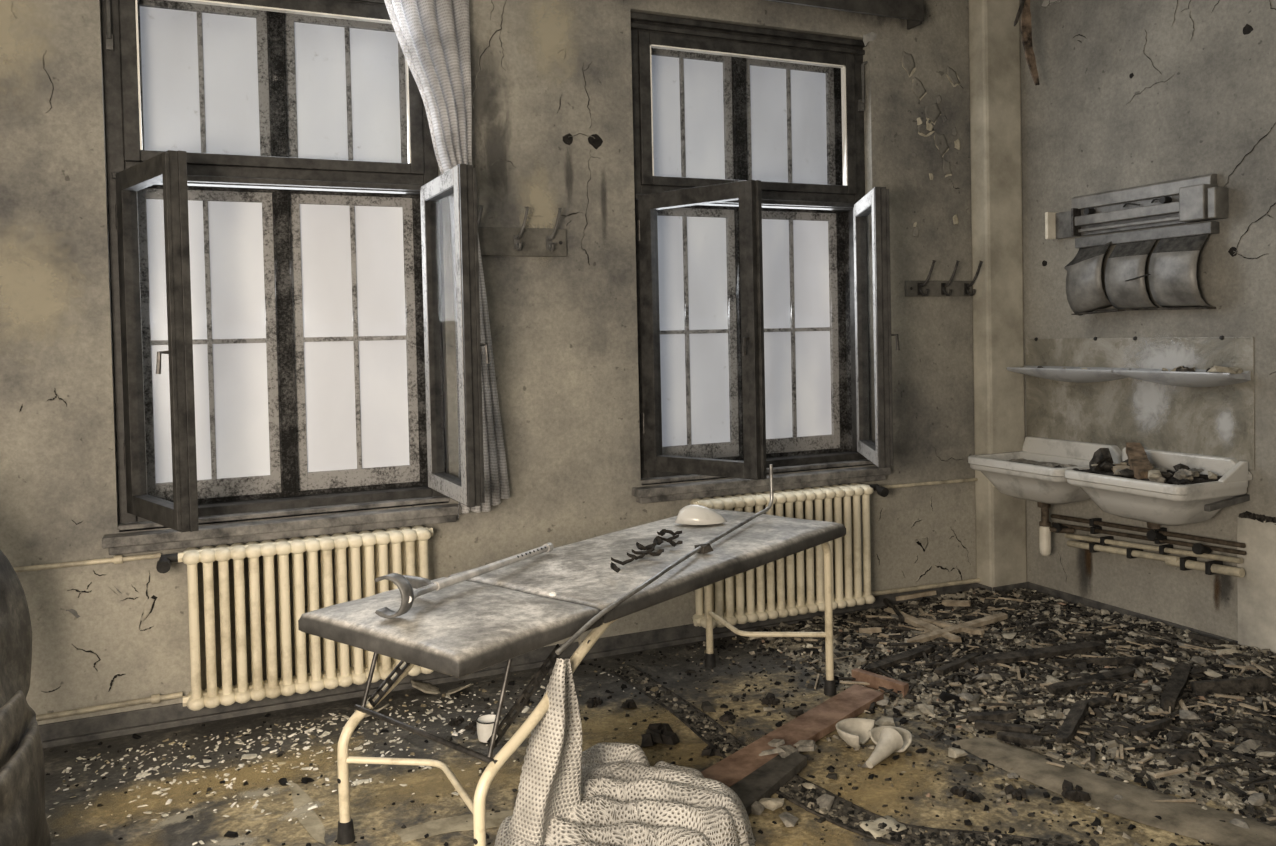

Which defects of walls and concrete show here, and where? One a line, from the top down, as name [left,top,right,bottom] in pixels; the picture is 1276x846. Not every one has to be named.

crack [472,0,507,108]
crack [1125,0,1220,105]
crack [528,49,601,266]
crack [1224,122,1276,187]
crack [1234,202,1276,259]
crack [67,570,154,631]
crack [71,643,126,692]